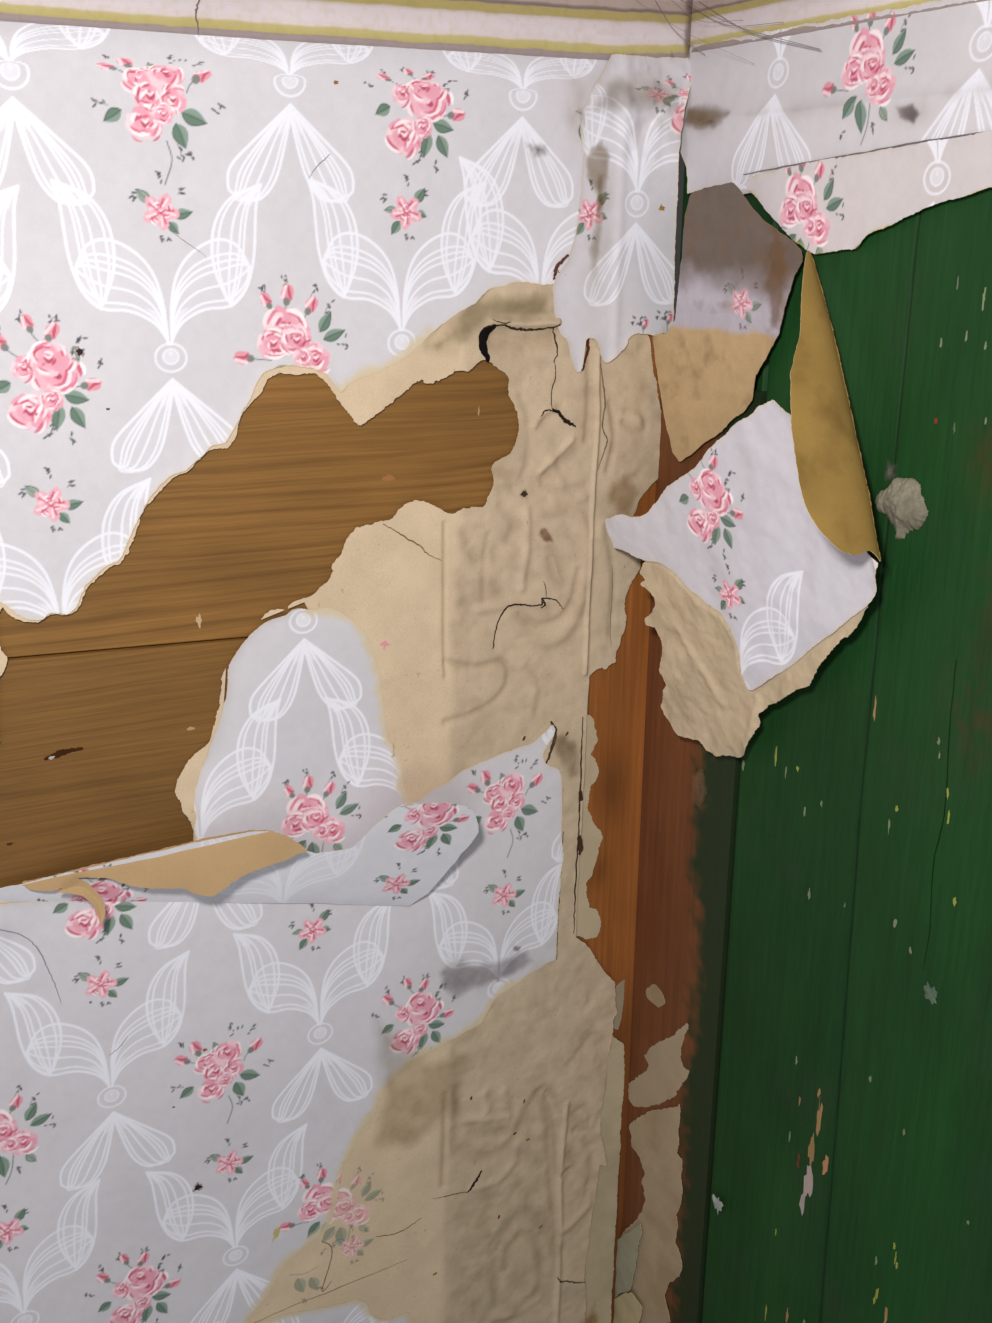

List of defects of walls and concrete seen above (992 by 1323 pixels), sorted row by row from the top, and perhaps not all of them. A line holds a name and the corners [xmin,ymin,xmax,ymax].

crack [487,319,608,469]
crack [492,581,563,649]
spalling [44,747,83,760]
peeling [248,282,661,1323]